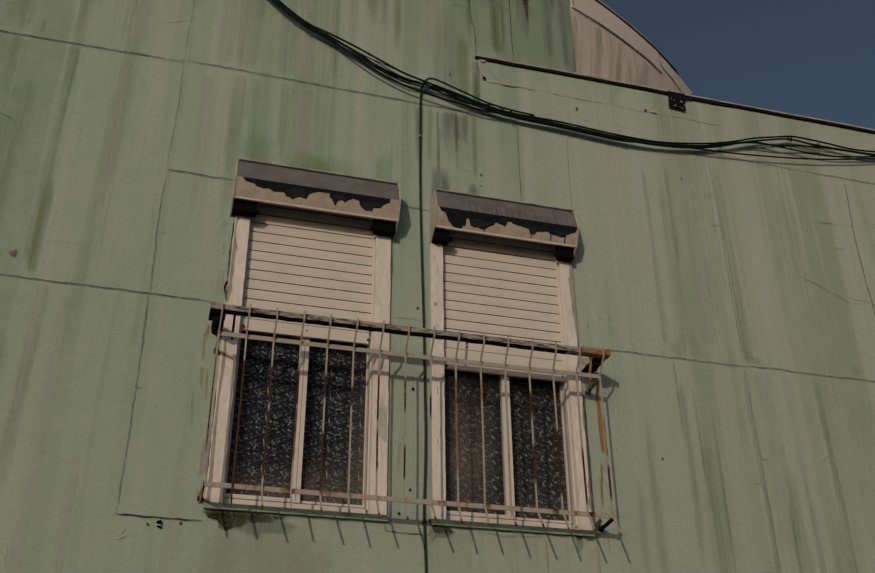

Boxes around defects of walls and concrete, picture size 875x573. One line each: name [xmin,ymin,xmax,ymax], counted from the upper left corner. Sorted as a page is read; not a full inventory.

peeling [243,177,390,211]
peeling [440,207,577,243]
corrosion [581,357,605,451]
damp [205,510,283,530]